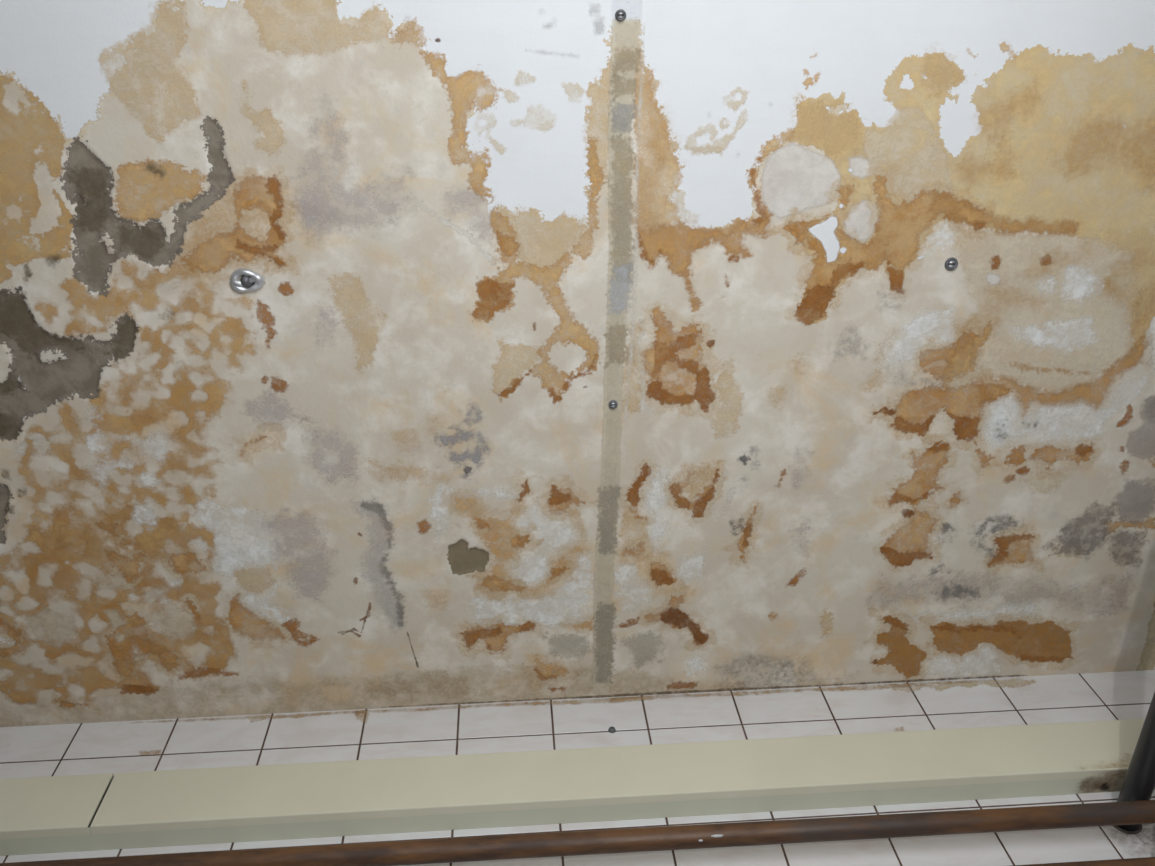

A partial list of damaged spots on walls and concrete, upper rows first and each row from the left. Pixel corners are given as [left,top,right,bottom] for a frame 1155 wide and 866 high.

water stain [0,76,74,283]
flaking render [0,70,236,303]
water stain [115,159,205,222]
water stain [419,40,610,403]
water stain [633,42,1155,459]
flaking render [0,484,14,544]
flaking render [0,286,139,441]
water stain [0,176,317,709]
flaking render [383,586,403,626]
flaking render [447,539,490,575]
water stain [429,407,594,656]
water stain [1050,481,1155,565]